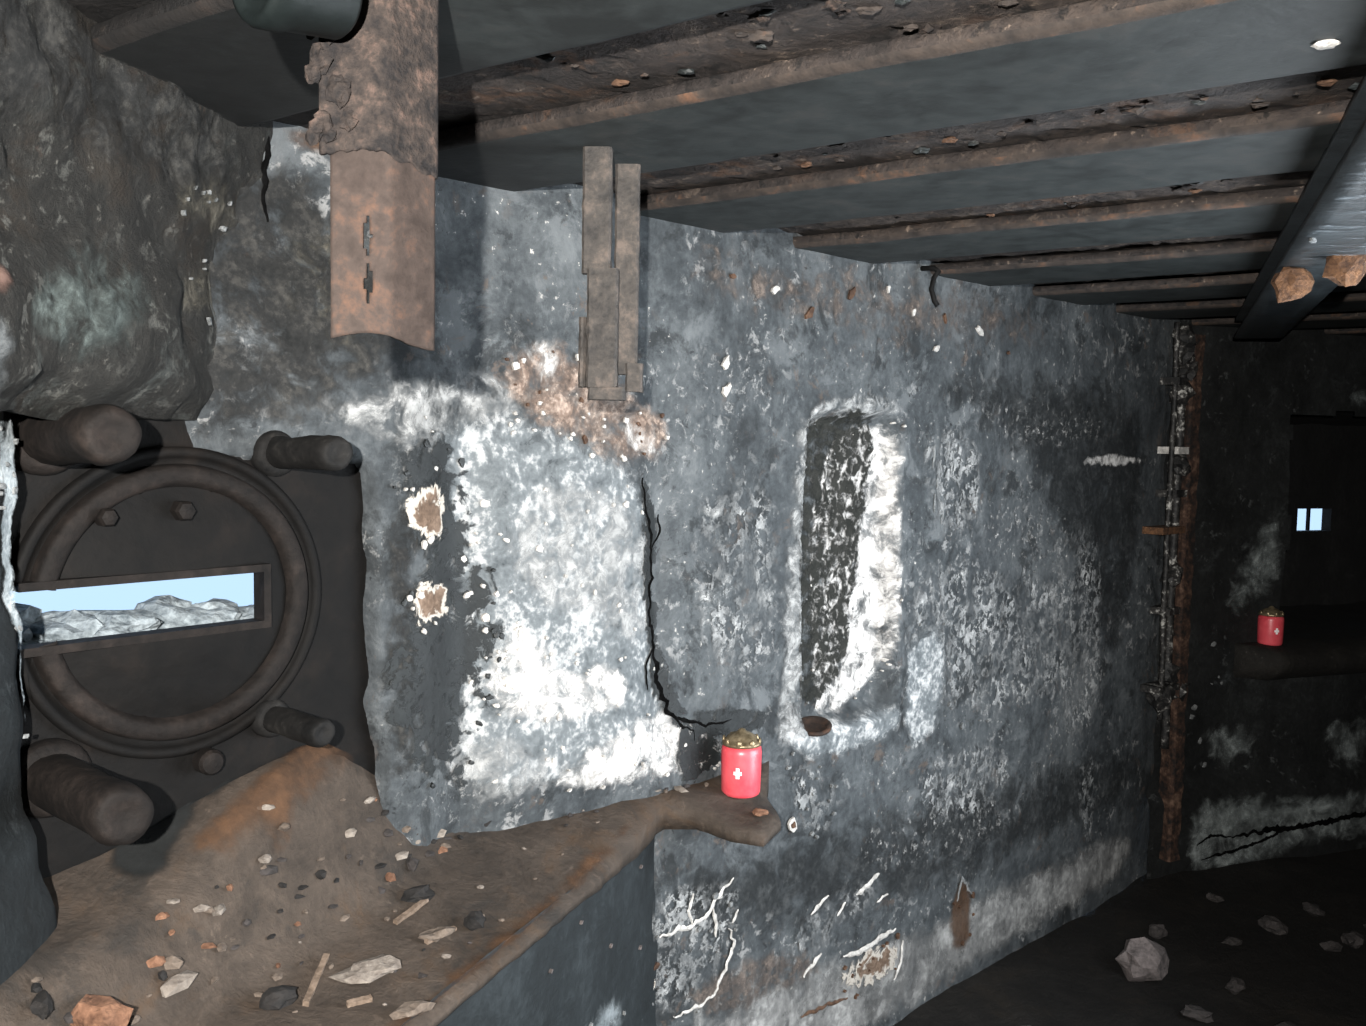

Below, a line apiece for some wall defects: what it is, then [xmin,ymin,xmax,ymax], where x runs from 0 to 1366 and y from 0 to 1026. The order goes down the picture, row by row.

water stain [539,345,556,373]
peeling [392,350,678,795]
crack [641,477,732,741]
crack [1197,811,1366,861]
water stain [695,839,1129,1026]